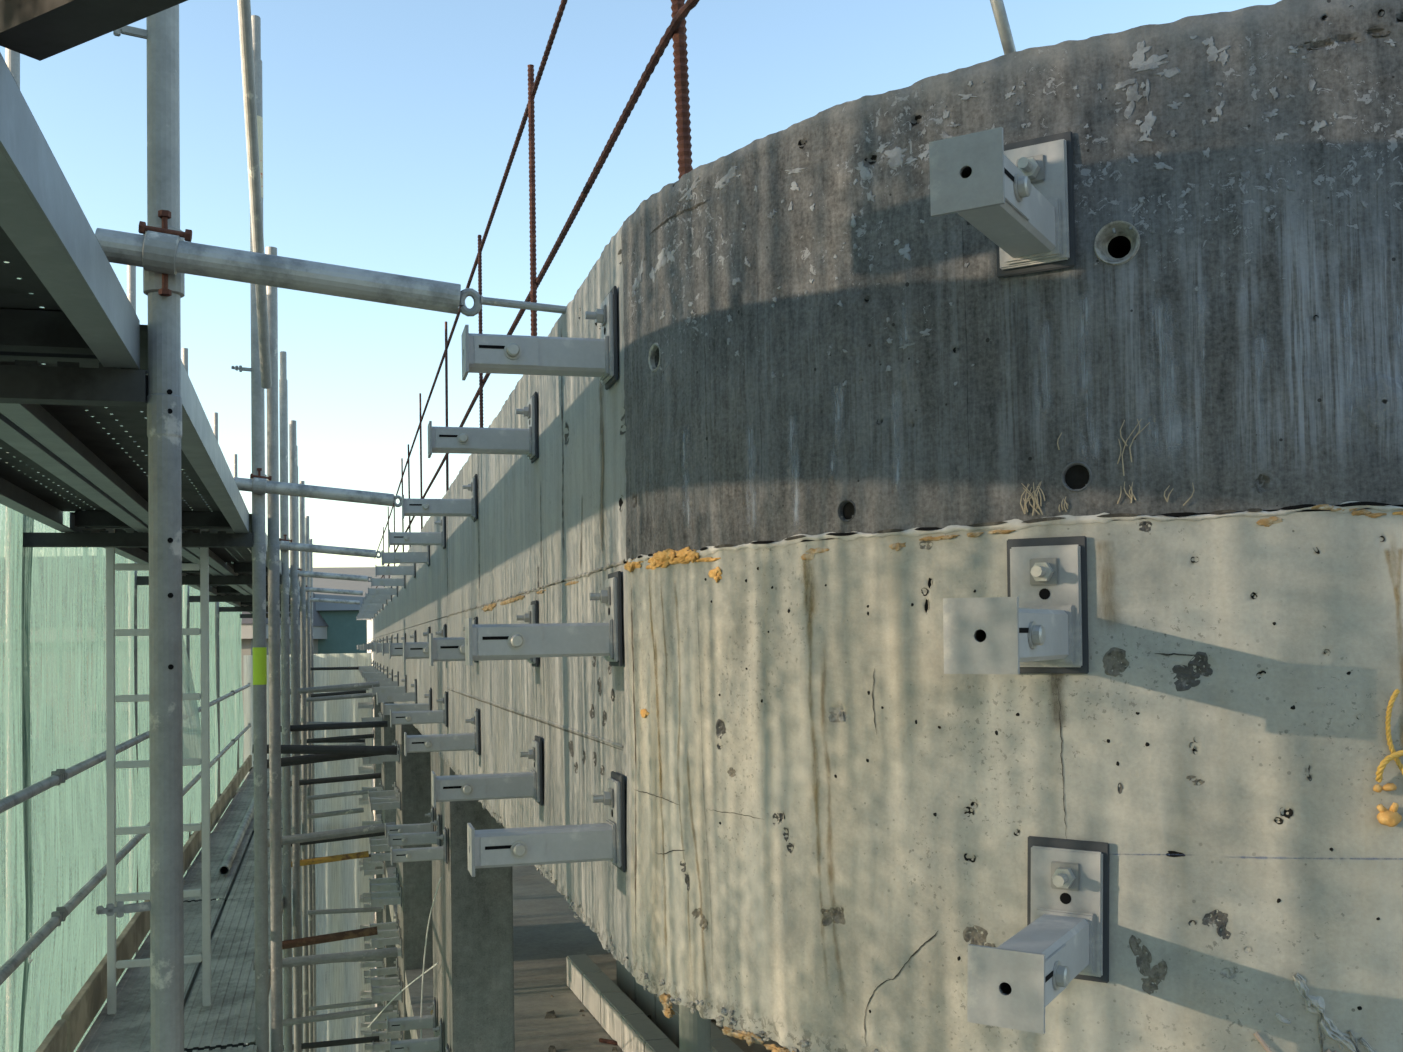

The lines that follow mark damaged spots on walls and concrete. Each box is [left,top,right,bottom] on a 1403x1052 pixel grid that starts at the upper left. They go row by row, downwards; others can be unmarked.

spalling [1288,9,1403,59]
peeling [1097,41,1190,170]
peeling [1190,35,1231,126]
peeling [1251,76,1338,141]
peeling [853,145,929,202]
leakage [1149,306,1182,445]
crack [1057,686,1067,839]
spalling [692,908,708,931]
spalling [820,906,846,926]
spalling [963,925,995,947]
crack [864,931,938,1042]
peeling [1293,973,1377,1052]